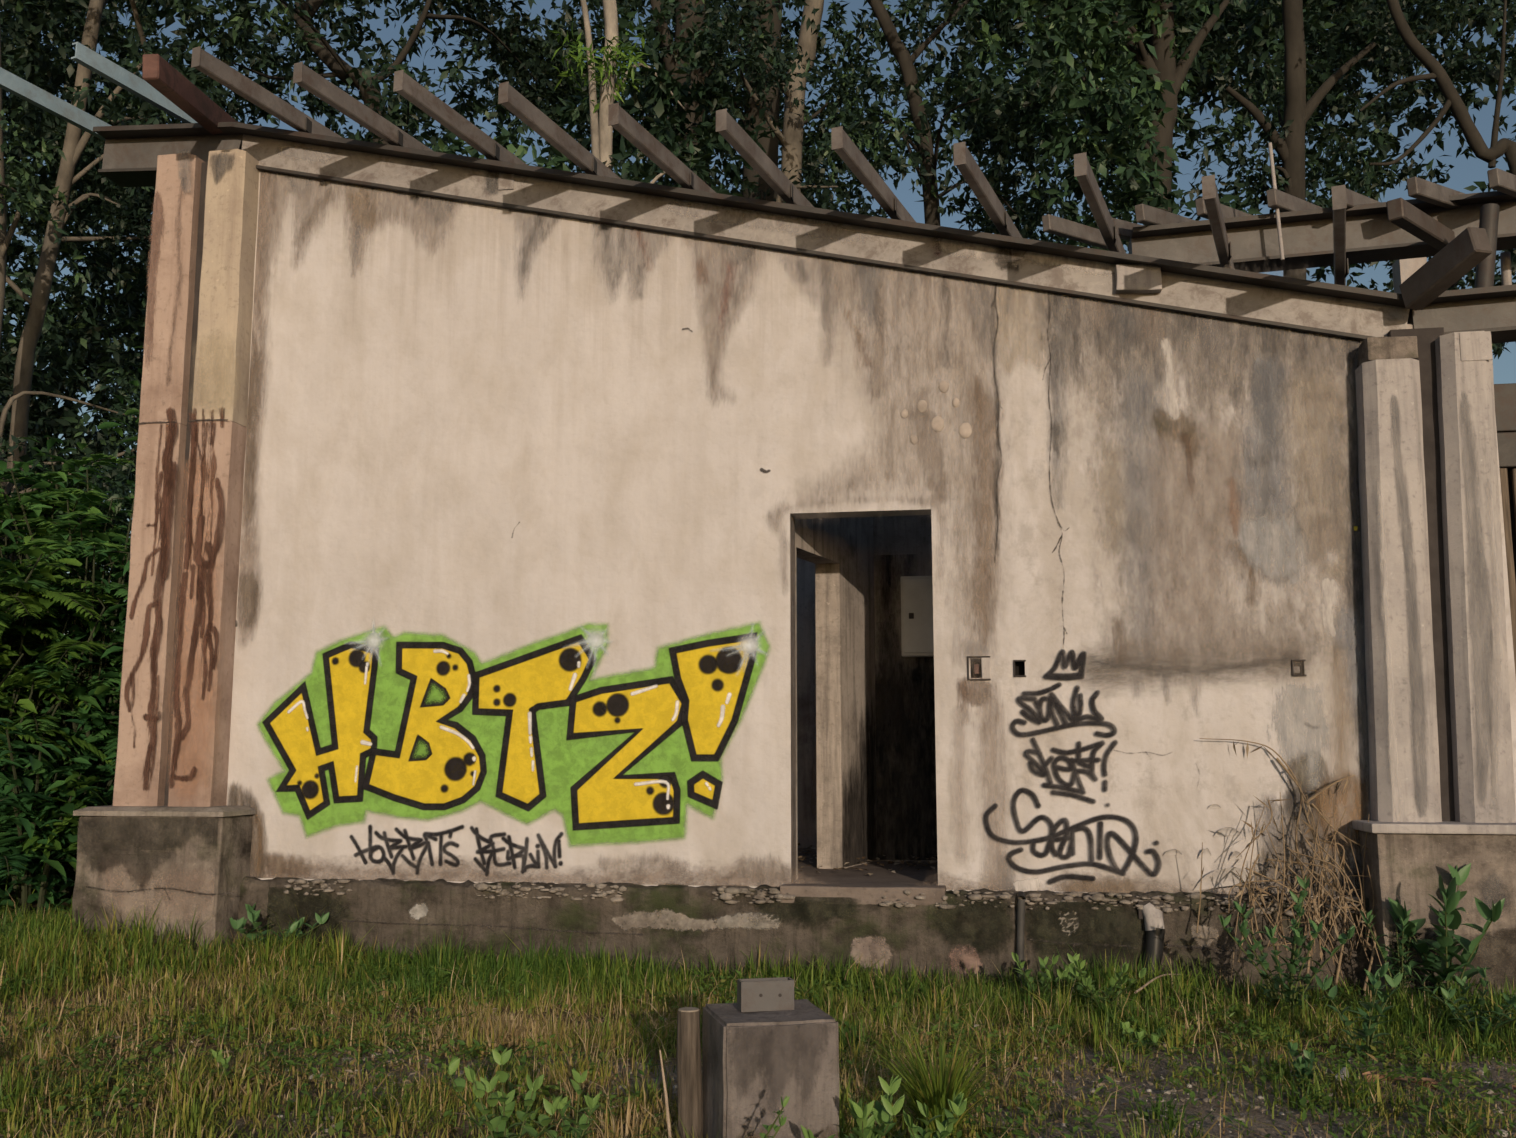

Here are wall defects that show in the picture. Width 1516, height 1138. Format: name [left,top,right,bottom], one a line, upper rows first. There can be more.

water stain [668,202,865,242]
corrosion [151,423,217,651]
crack [1043,292,1069,644]
water stain [791,239,1370,820]
water stain [1379,495,1390,680]
water stain [1390,397,1427,818]
water stain [843,554,938,867]
spalling [283,879,352,896]
spalling [409,904,428,919]
spalling [473,882,796,932]
spalling [879,827,1361,947]
water stain [1063,755,1363,897]